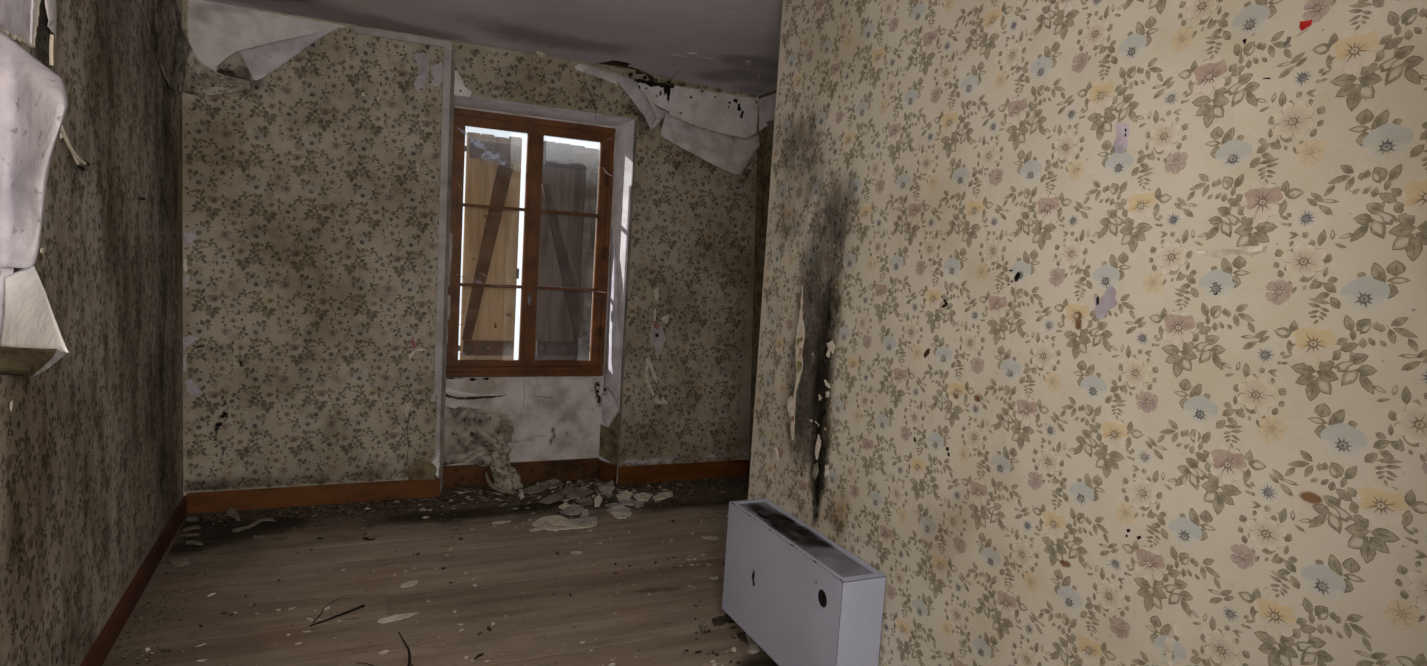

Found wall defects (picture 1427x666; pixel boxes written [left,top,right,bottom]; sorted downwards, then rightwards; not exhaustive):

flaking render [0,0,41,48]
flaking render [186,0,348,71]
flaking render [574,64,776,139]
water stain [717,190,848,547]